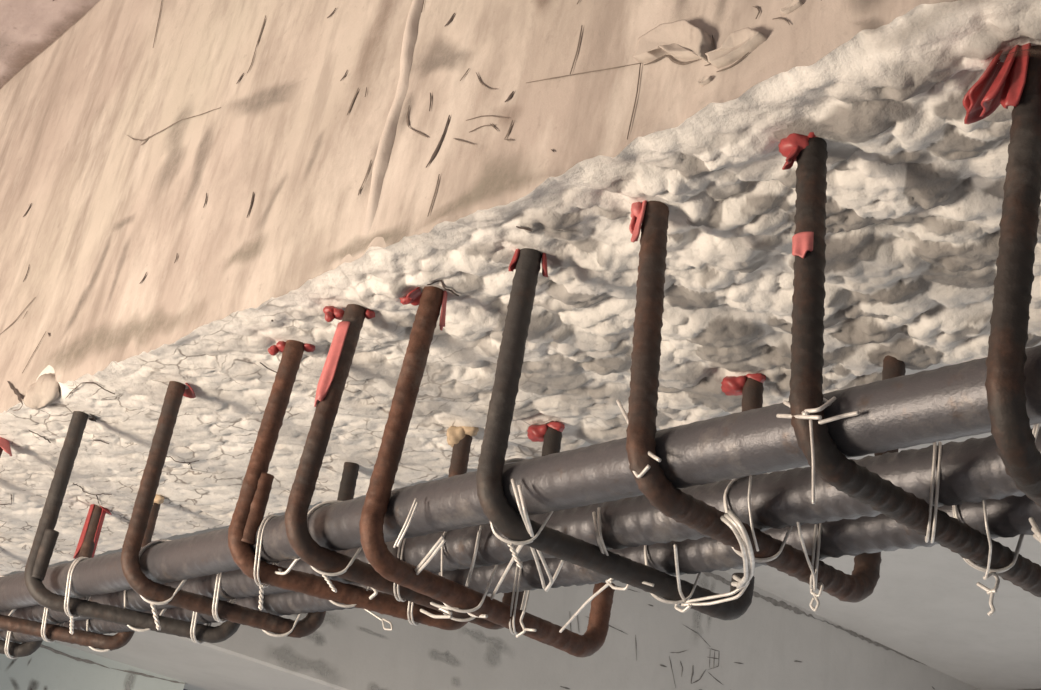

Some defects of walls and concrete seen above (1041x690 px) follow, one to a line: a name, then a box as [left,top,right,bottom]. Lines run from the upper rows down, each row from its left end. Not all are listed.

crack [126,107,221,145]
crack [406,105,513,216]
crack [460,68,496,90]
crack [527,0,749,140]
peeling [632,20,768,87]
spalling [626,43,1041,603]
crack [7,332,51,443]
crack [66,382,115,398]
crack [74,484,112,505]
spalling [0,248,755,658]